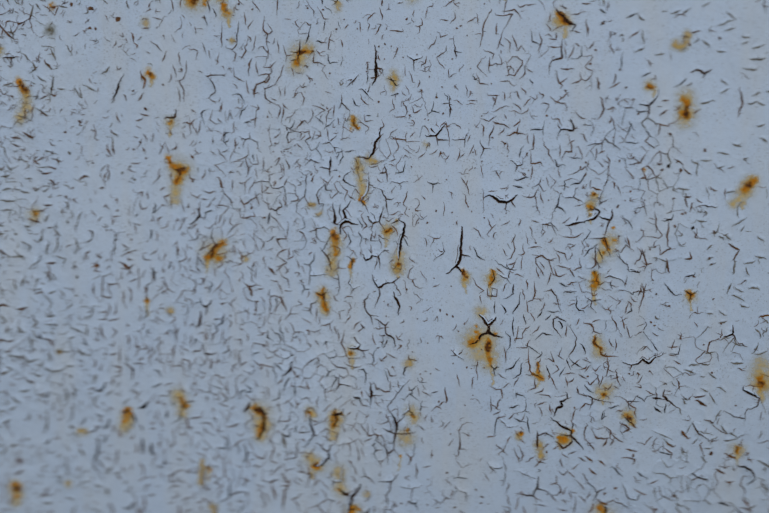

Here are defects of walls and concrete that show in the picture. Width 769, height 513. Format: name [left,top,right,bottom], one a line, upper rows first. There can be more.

rust [218,0,232,28]
rust [552,11,572,39]
rust [15,78,32,123]
rust [678,92,695,126]
rust [165,156,189,204]
rust [355,156,378,206]
rust [729,176,758,209]
rust [204,239,227,273]
rust [325,229,341,276]
rust [316,287,330,316]
rust [463,308,498,385]
rust [120,407,134,431]